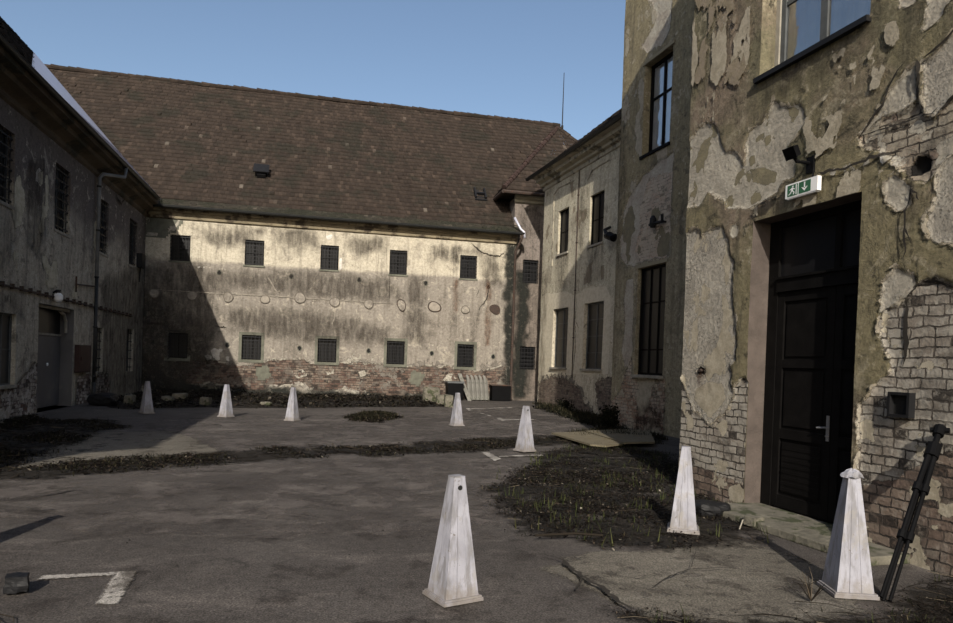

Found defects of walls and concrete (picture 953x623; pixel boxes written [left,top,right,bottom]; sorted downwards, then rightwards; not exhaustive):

peeling [570,180,588,228]
spalling [619,78,674,267]
spalling [625,0,673,58]
spalling [687,0,846,216]
spalling [832,20,953,247]
spalling [898,0,950,31]
damp [98,265,423,399]
peeling [537,251,666,434]
spalling [678,223,748,503]